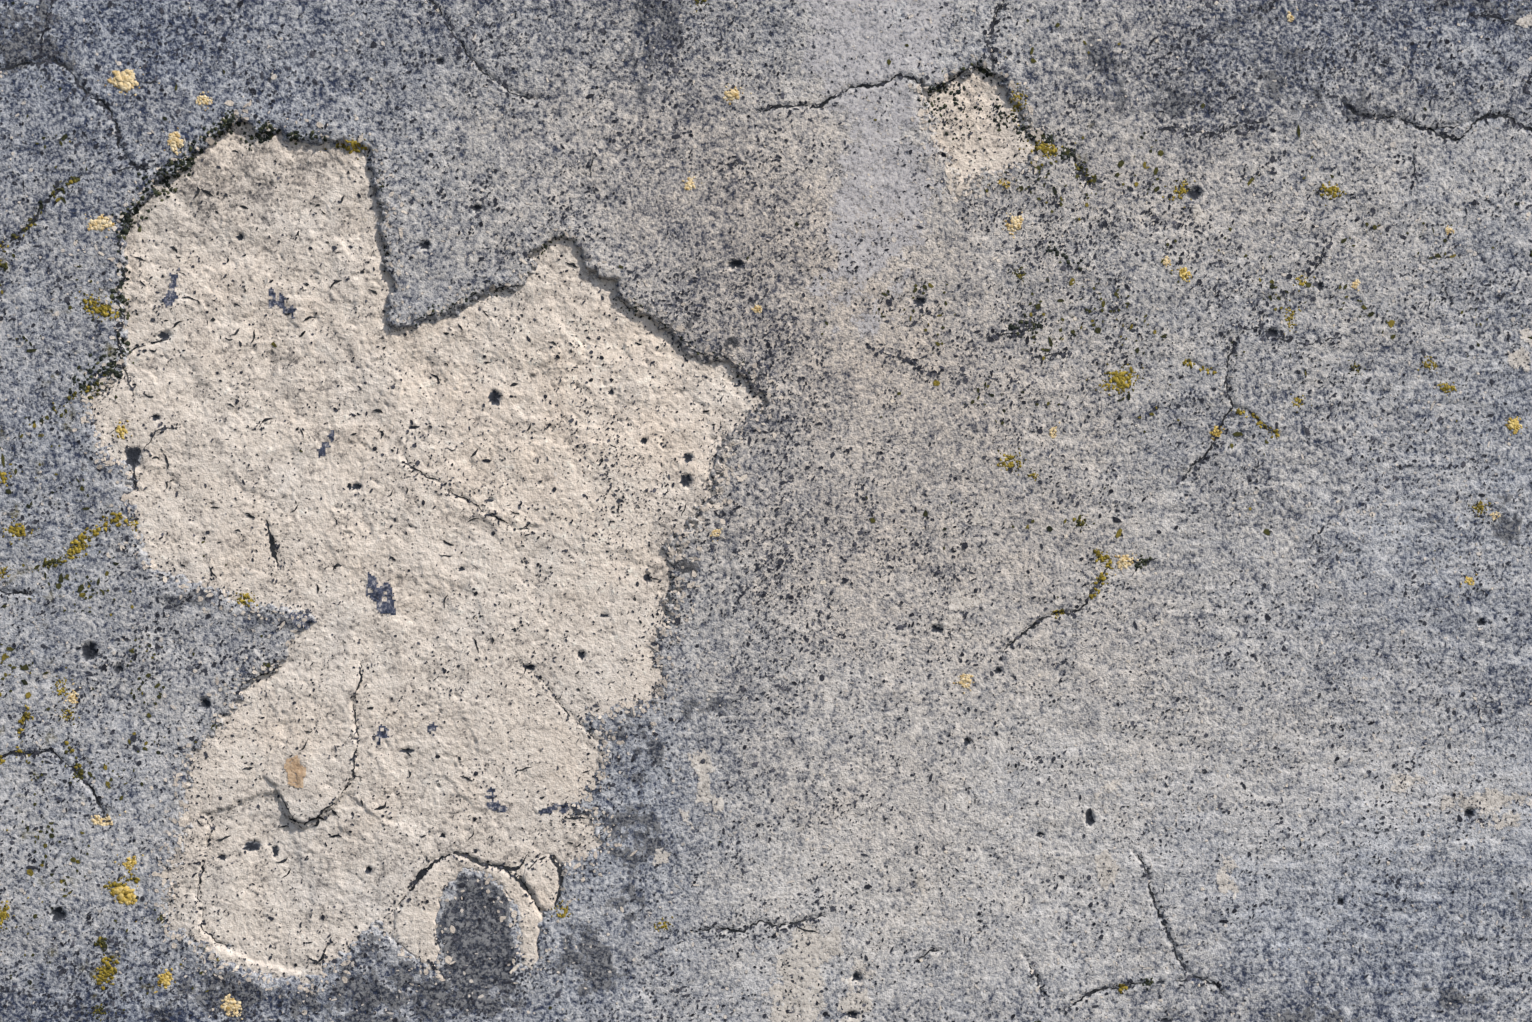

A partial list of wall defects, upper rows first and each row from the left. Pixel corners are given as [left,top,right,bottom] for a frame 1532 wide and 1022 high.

crack [986,0,1004,64]
crack [764,74,922,111]
spalling [908,50,1056,220]
crack [990,308,1067,358]
crack [1186,327,1336,474]
spalling [69,99,784,1015]
crack [1004,558,1158,650]
crack [1137,854,1225,996]
crack [1028,962,1141,1008]